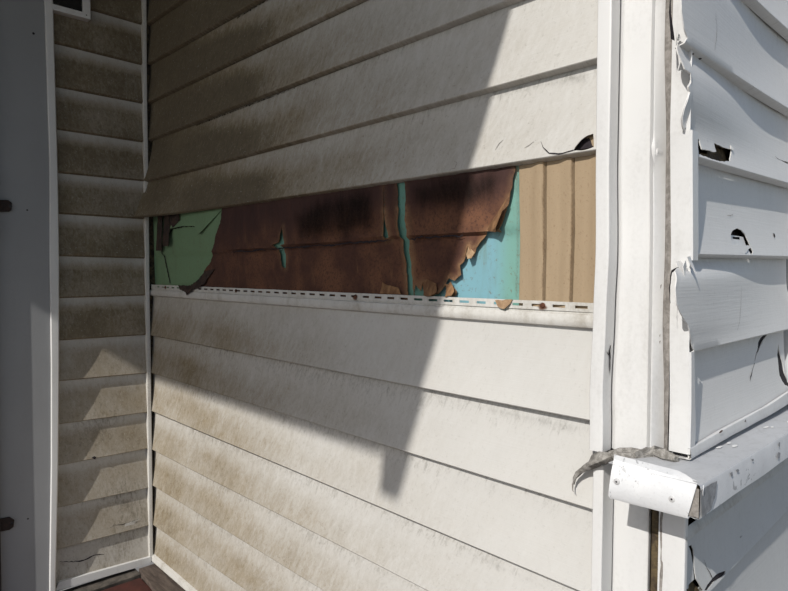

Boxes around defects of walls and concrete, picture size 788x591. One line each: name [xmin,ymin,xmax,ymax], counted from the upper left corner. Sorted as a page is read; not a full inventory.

crack [777,351,788,386]
crack [705,563,725,590]